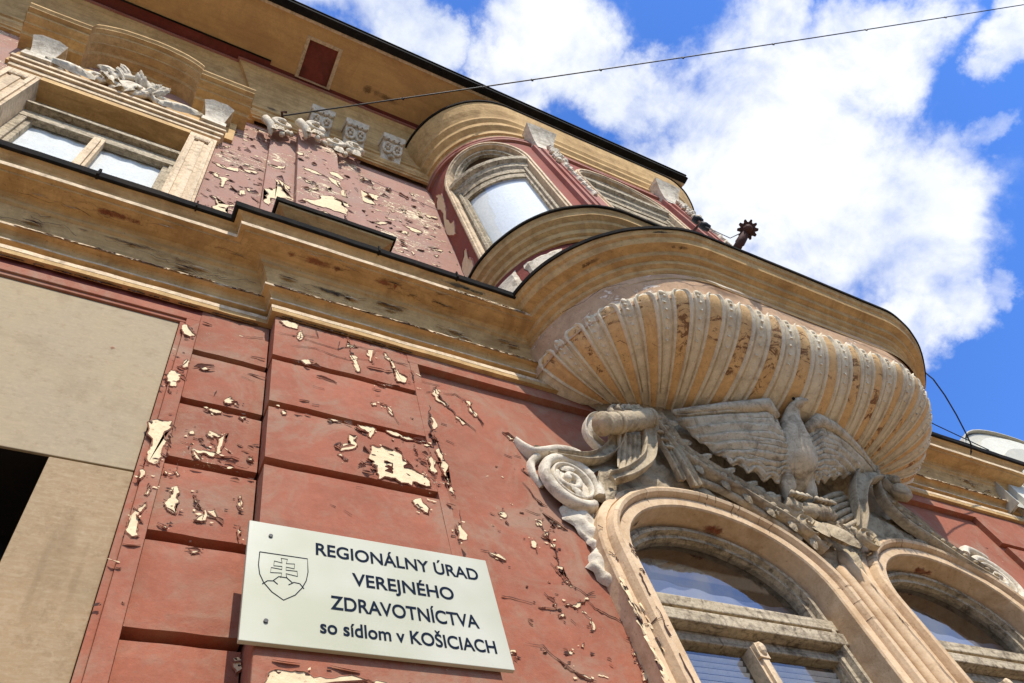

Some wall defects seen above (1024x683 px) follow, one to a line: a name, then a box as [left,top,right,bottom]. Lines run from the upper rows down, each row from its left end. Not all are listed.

peeling [202,124,474,277]
peeling [0,254,199,309]
peeling [159,324,215,393]
peeling [203,391,249,422]
peeling [279,316,421,389]
peeling [123,418,259,545]
peeling [327,401,468,544]
peeling [490,504,587,625]